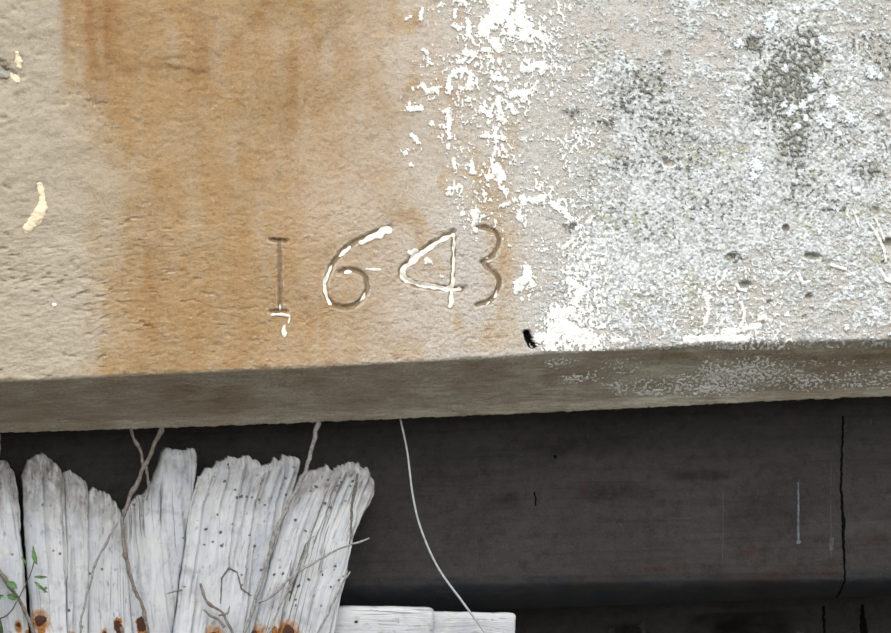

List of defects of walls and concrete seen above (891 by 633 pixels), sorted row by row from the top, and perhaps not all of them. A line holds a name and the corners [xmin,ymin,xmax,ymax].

spalling [0,51,23,83]
peeling [395,0,849,365]
peeling [563,374,597,383]
crack [822,416,846,633]
crack [859,605,868,633]